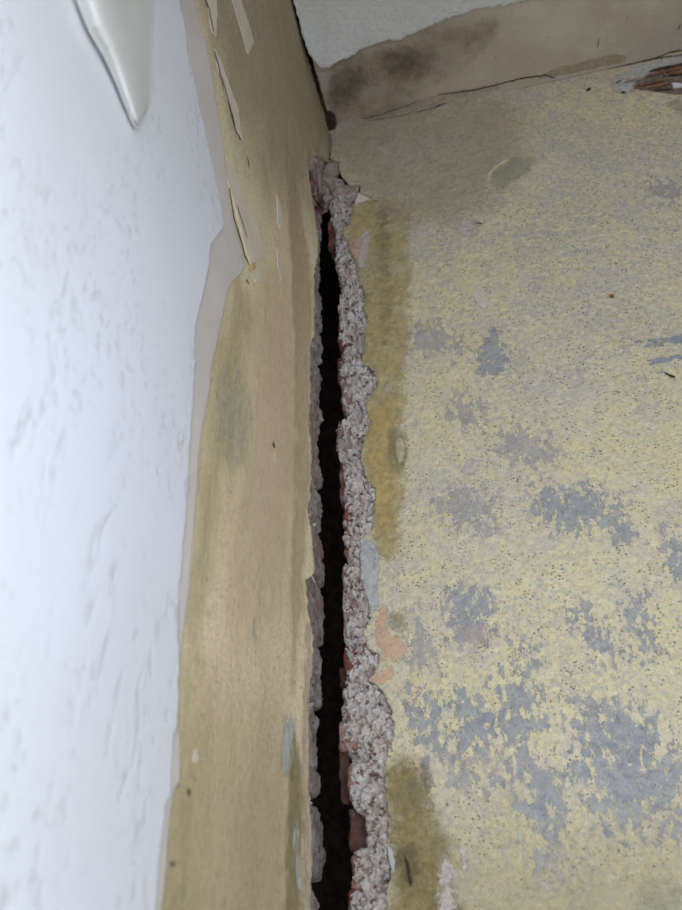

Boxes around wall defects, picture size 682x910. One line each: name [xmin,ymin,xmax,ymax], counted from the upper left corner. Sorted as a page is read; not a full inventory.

crack [292,0,395,910]
damp [329,52,520,559]
flaking render [615,63,682,94]
damp [385,760,445,910]